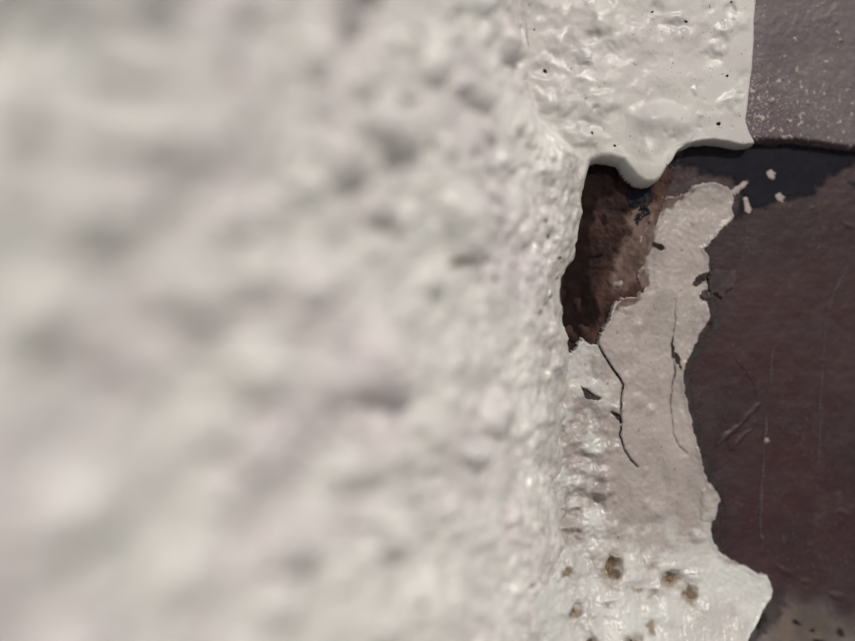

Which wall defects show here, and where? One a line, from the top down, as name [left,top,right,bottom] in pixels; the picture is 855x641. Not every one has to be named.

spalling [559,144,855,353]
crack [581,346,637,467]
crack [670,308,684,450]
corrosion [605,556,620,578]
corrosion [663,572,678,586]
corrosion [682,588,696,603]